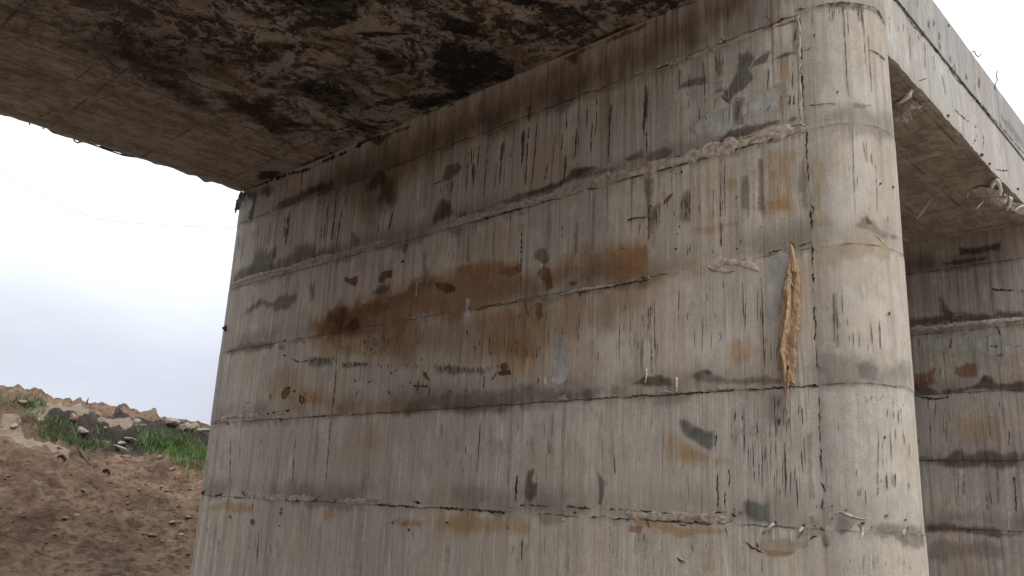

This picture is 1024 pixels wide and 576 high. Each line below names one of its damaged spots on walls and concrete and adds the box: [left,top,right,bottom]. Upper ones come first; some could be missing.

water stain [466,97,616,201]
crack [586,133,770,189]
crack [723,0,1024,509]
crack [216,395,327,422]
crack [388,373,539,396]
crack [580,387,783,400]
crack [373,433,763,553]